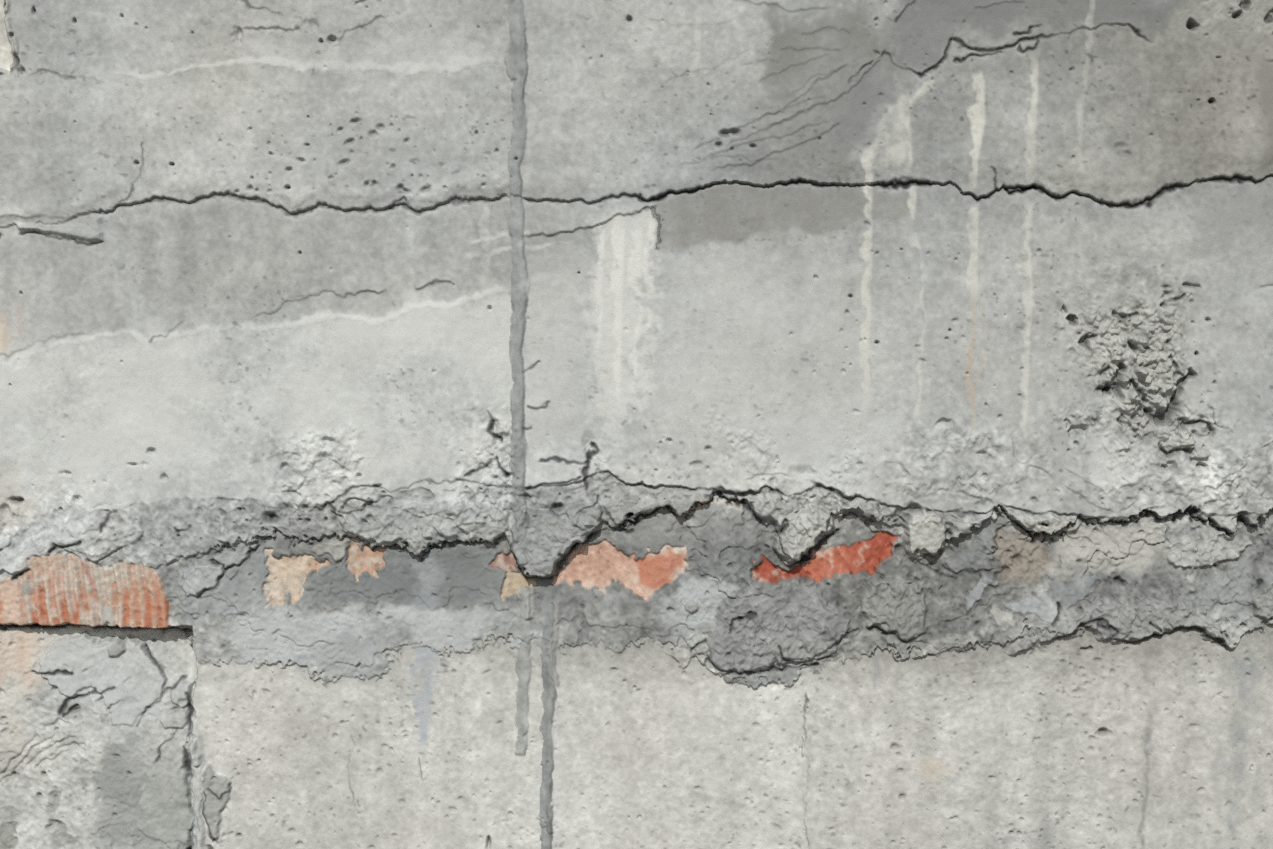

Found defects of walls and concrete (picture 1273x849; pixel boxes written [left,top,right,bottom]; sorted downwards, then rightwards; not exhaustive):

flaking render [0,0,20,73]
crack [0,0,77,79]
crack [240,0,302,32]
water stain [0,204,575,460]
crack [0,141,1273,246]
water stain [577,60,936,433]
water stain [963,68,989,435]
crack [848,0,1155,85]
water stain [1022,53,1040,182]
water stain [1013,198,1058,447]
spalling [1064,282,1221,468]
crack [0,400,1264,849]